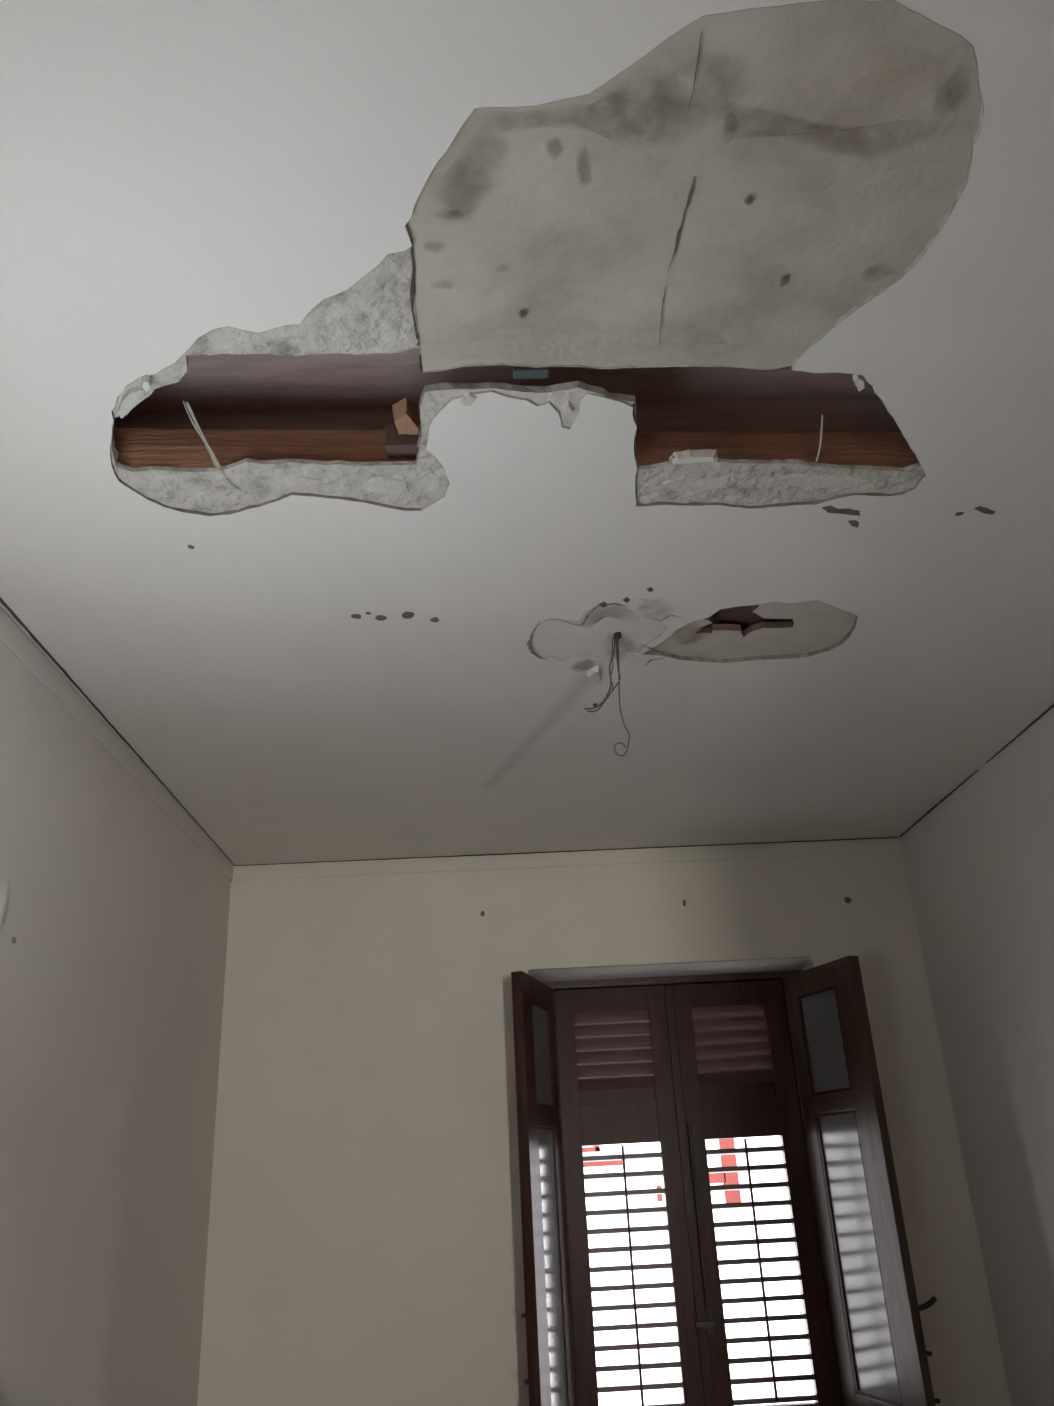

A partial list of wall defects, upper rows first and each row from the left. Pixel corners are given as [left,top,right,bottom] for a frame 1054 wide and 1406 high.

crack [688,30,702,108]
flaking render [110,0,983,528]
flaking render [527,597,858,684]